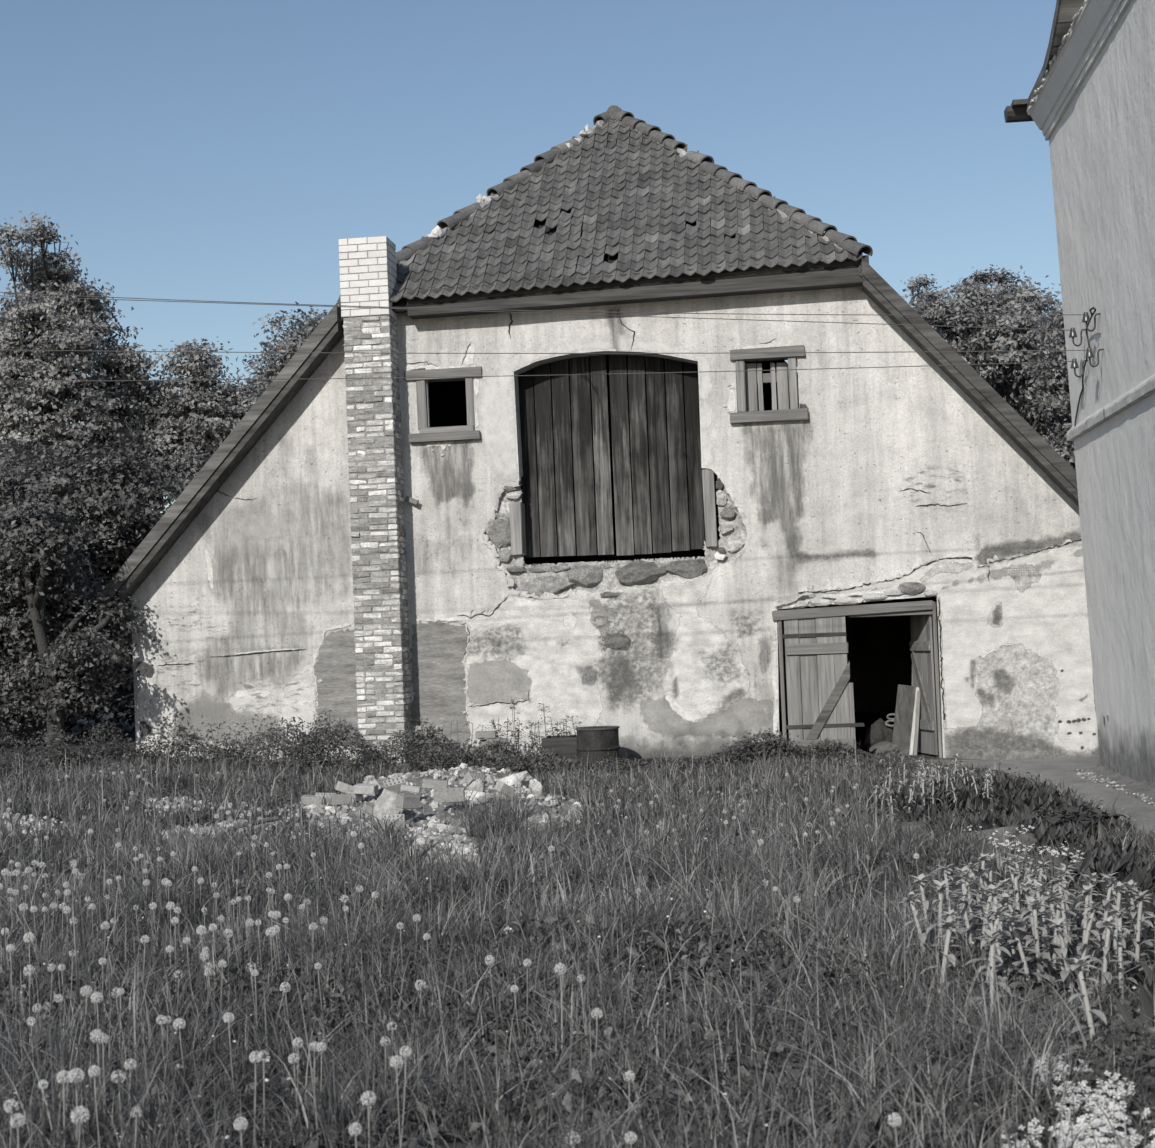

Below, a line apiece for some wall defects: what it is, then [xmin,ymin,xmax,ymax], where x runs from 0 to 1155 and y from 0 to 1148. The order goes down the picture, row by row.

damp [423,443,473,502]
damp [761,424,873,560]
crack [212,648,306,657]
peeling [229,623,354,742]
damp [602,596,669,702]
peeling [411,468,1099,754]